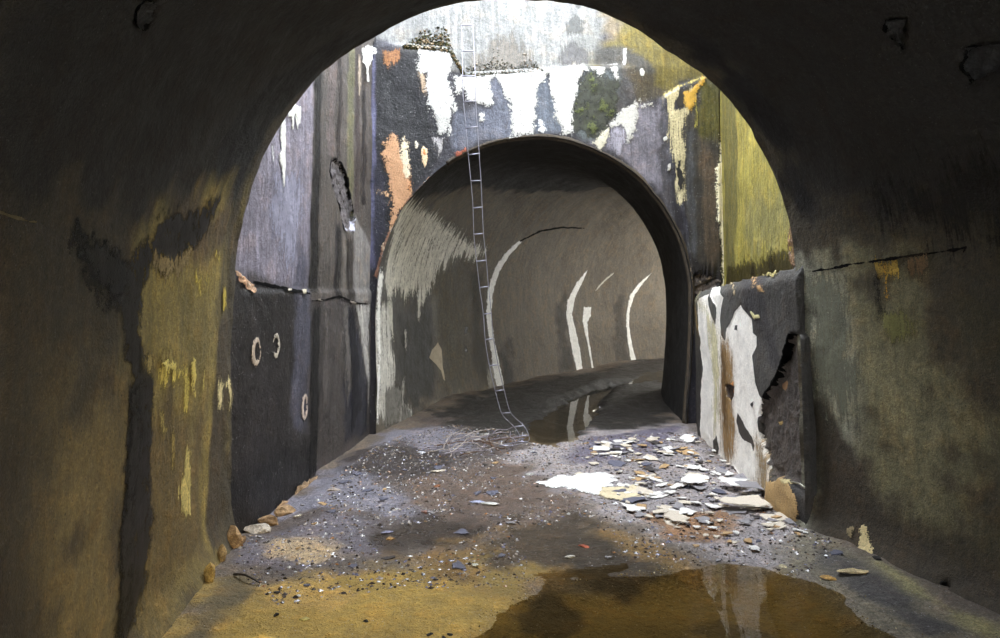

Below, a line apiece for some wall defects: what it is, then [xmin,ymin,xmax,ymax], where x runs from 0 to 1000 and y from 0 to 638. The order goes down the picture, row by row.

damp [415,49,620,156]
spalling [329,158,356,233]
spalling [373,220,396,278]
rust [376,133,428,229]
damp [714,134,795,286]
crack [812,246,967,272]
damp [68,196,221,638]
flaking render [585,274,808,551]